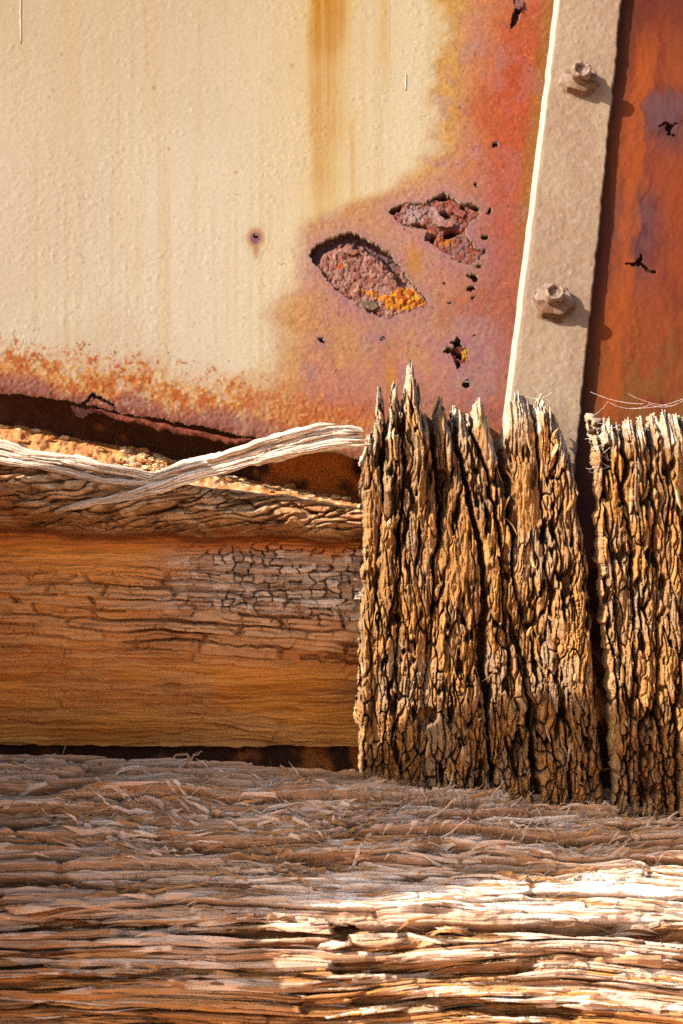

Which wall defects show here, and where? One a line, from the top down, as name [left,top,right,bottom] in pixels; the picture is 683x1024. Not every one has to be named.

corrosion [0,0,554,459]
peeling [428,204,466,228]
peeling [510,0,524,29]
corrosion [591,20,683,430]